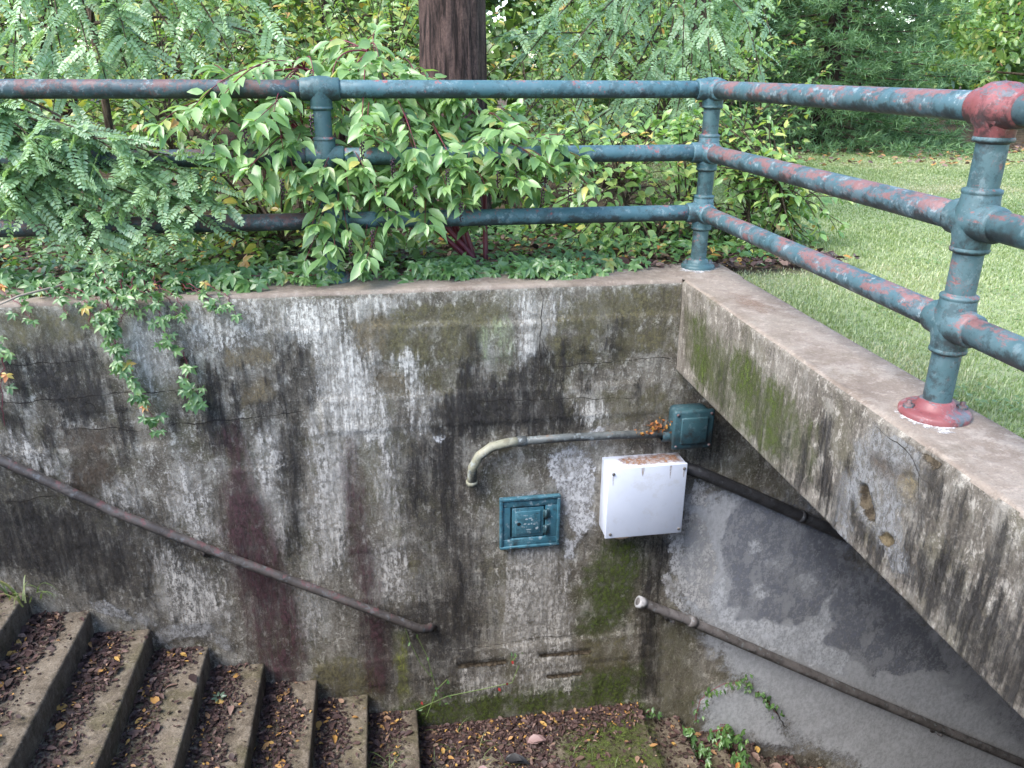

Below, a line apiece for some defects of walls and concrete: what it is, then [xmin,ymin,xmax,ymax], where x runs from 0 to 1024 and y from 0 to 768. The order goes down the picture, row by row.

damp [0,307,138,510]
crack [1,390,174,432]
crack [172,411,300,438]
damp [181,286,680,579]
crack [873,423,936,501]
damp [134,463,230,638]
corrosion [220,427,305,683]
damp [372,539,413,601]
damp [460,668,506,702]
damp [501,546,579,695]
peeling [662,479,946,677]
damp [597,455,1024,768]